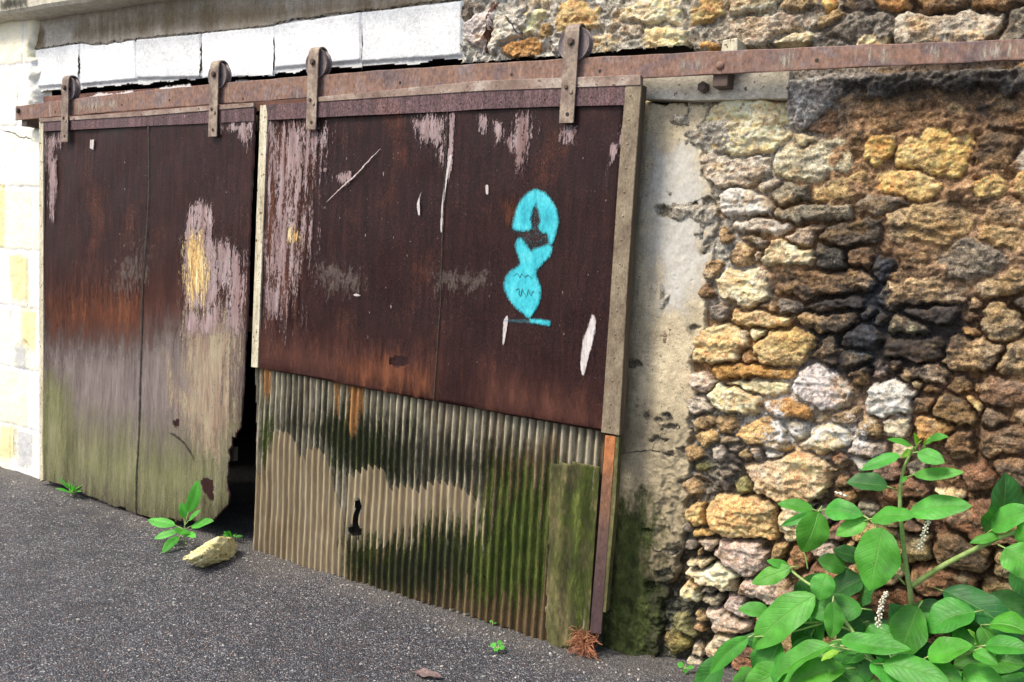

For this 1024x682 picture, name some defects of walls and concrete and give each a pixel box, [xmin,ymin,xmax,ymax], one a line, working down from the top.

peeling [44,132,65,222]
peeling [178,199,247,339]
rust [266,121,312,325]
peeling [261,119,352,341]
peeling [410,112,455,182]
peeling [478,109,540,174]
rust [505,200,515,224]
peeling [559,125,577,146]
leakage [166,304,241,468]
rust [334,351,439,435]
spalling [644,411,686,459]
leakage [633,561,675,658]